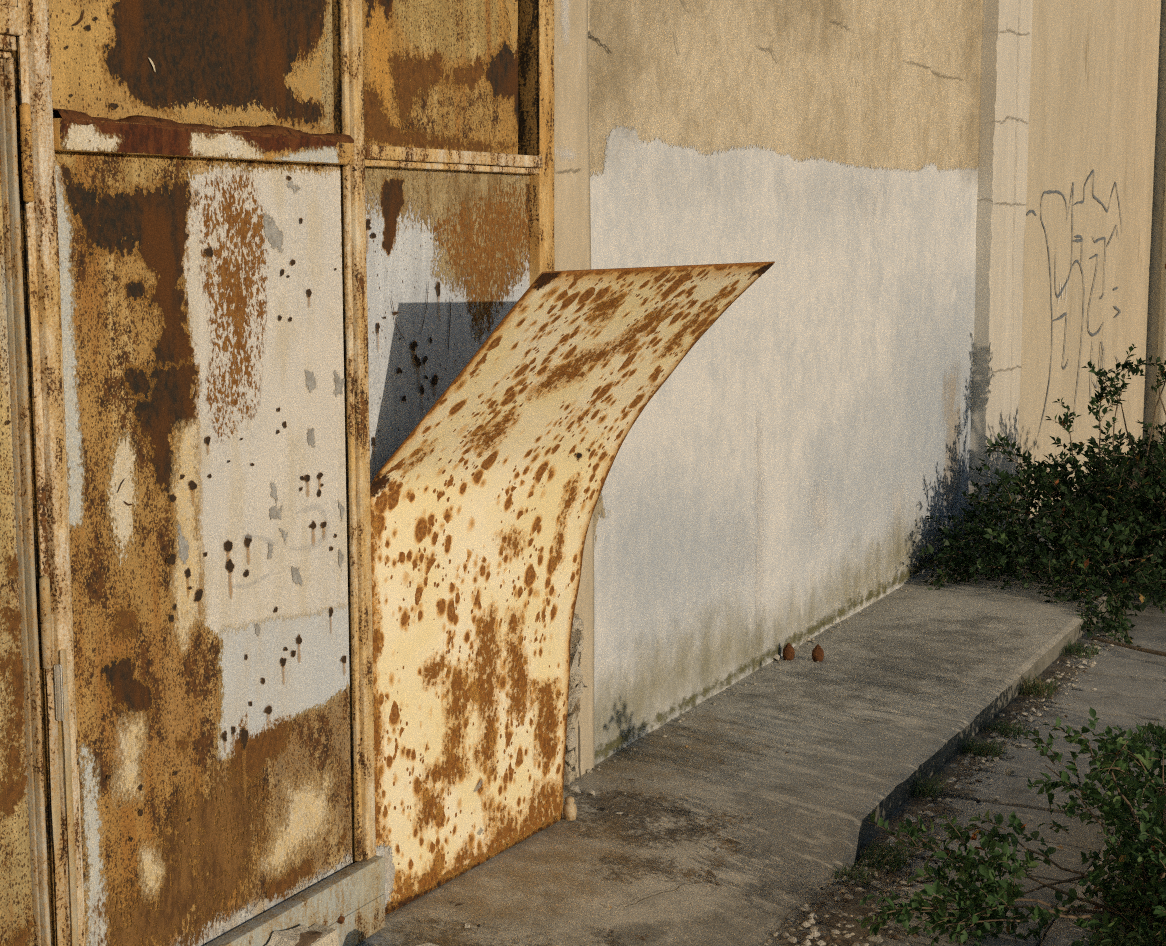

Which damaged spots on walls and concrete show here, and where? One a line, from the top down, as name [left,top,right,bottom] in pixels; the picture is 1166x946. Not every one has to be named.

rust [0,597,27,817]
rust [101,606,155,720]
rust [93,714,314,946]
peeling [165,97,350,761]
rust [53,0,520,507]
rust [370,471,390,678]
rust [373,692,390,847]
rust [385,606,564,915]
rust [552,473,580,572]
rust [528,304,676,401]
damp [753,617,1023,710]
damp [912,367,961,506]